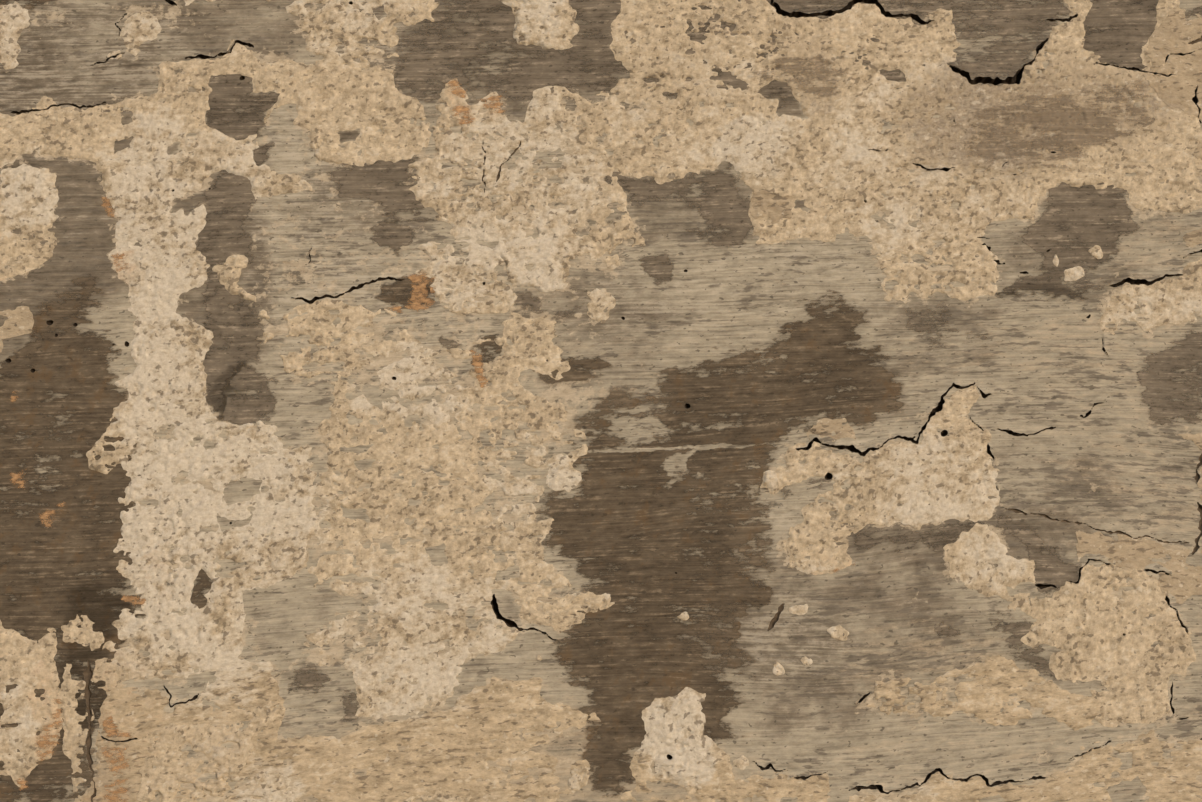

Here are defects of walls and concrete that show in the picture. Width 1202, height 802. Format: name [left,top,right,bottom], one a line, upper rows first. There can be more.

crack [91,13,127,66]
crack [770,0,931,25]
crack [949,15,1077,86]
crack [1094,36,1202,123]
flaking render [408,0,1202,316]
crack [291,277,405,304]
flaking render [0,0,615,802]
crack [795,382,1202,632]
crack [491,594,557,640]
crack [1170,682,1202,740]
crack [752,761,826,780]
crack [849,768,1046,794]